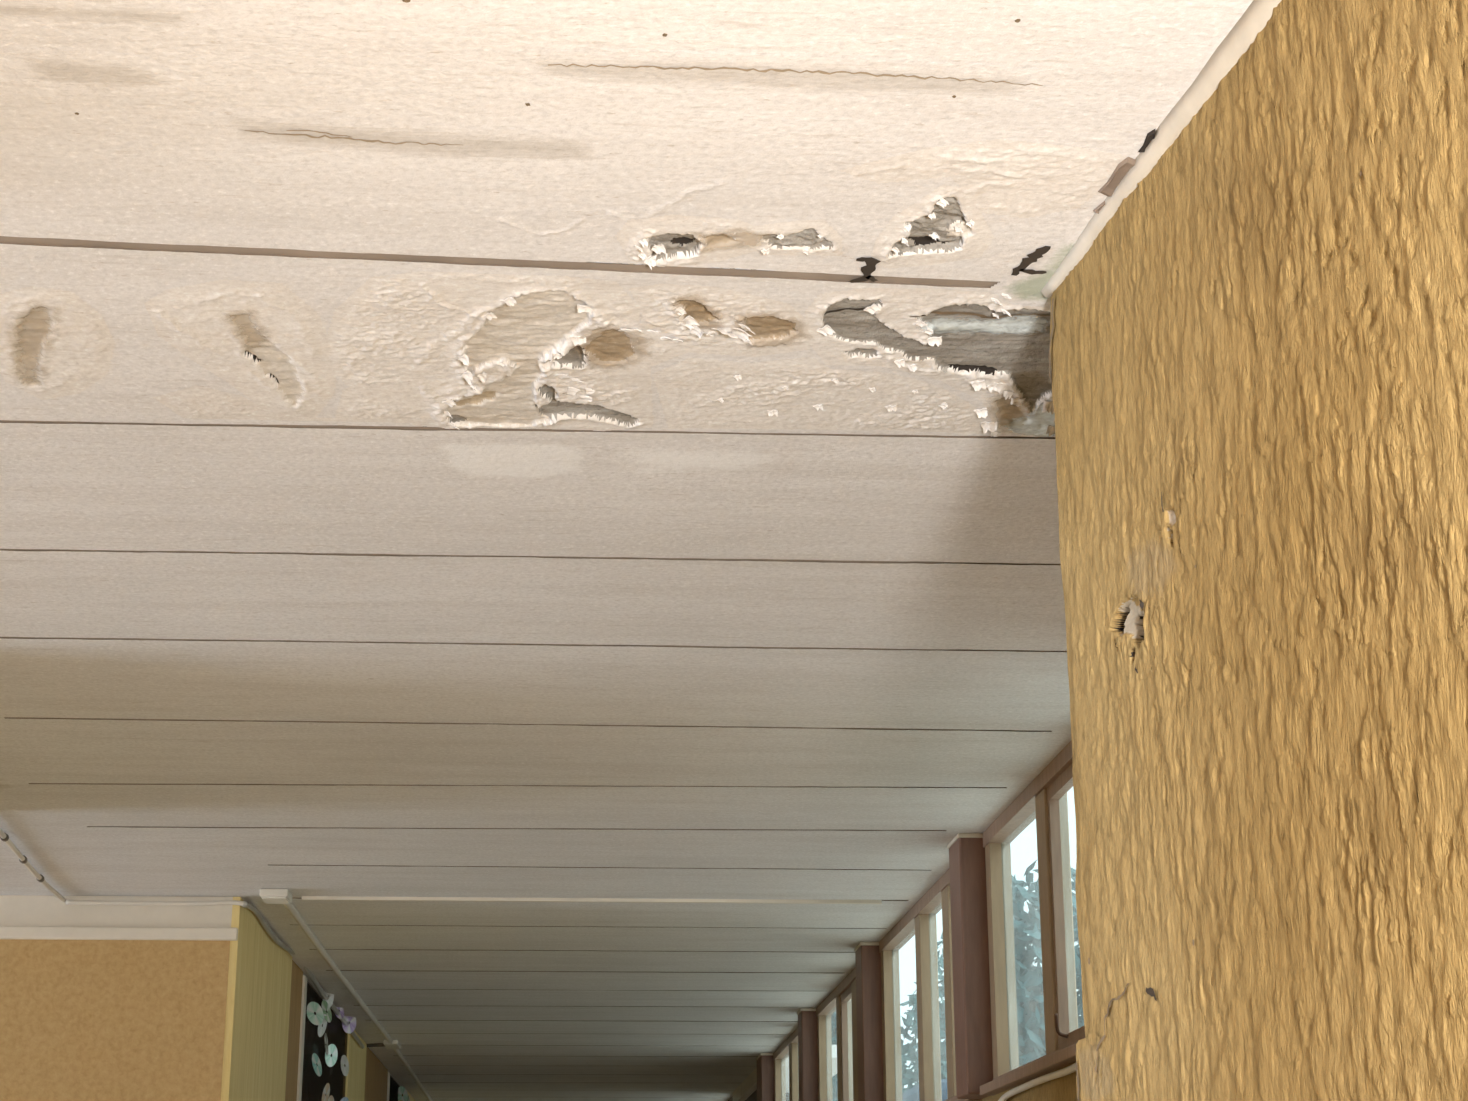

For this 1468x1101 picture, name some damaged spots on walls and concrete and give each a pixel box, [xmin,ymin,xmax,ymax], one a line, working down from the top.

crack [548,64,1043,86]
spalling [615,215,843,270]
spalling [871,185,995,269]
peeling [327,271,755,431]
spalling [804,288,1055,437]
spalling [1098,583,1160,681]